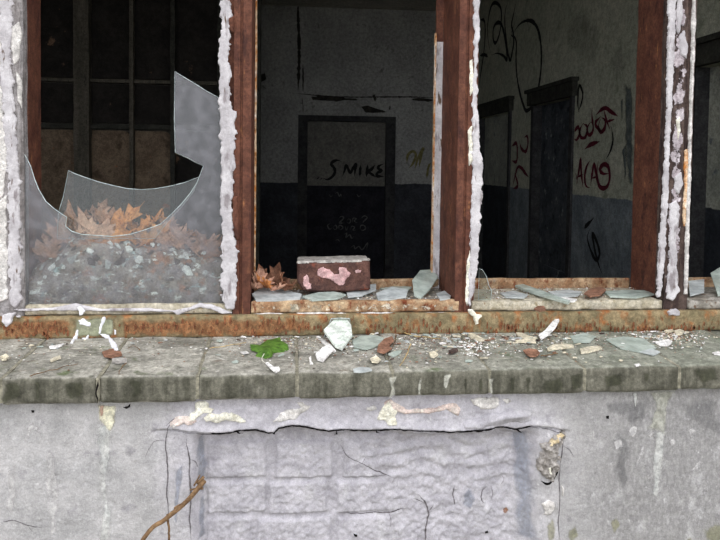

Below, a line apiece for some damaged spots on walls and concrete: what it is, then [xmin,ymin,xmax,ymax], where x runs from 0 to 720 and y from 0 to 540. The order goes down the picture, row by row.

rust [0,319,69,340]
rust [119,315,328,337]
rust [366,318,468,335]
rust [486,321,715,334]
water stain [2,383,20,401]
water stain [66,383,82,399]
water stain [543,379,563,392]
water stain [696,369,717,382]
peeling [367,399,460,426]
water stain [648,391,674,496]
spalling [536,430,566,496]
crack [145,418,573,540]